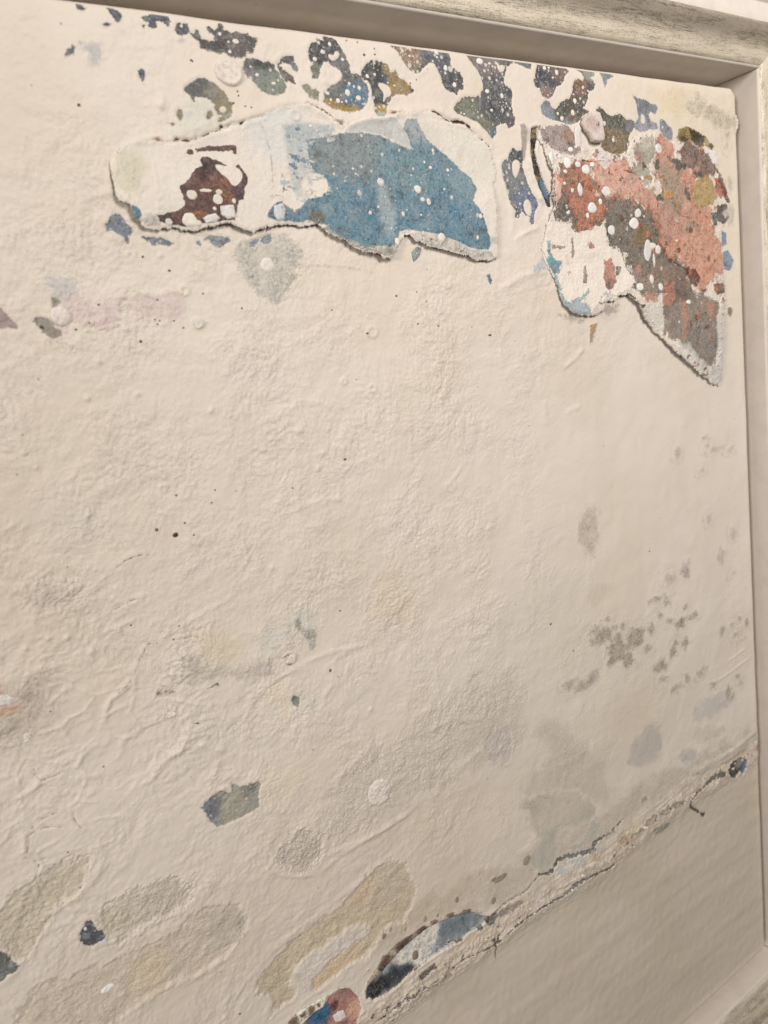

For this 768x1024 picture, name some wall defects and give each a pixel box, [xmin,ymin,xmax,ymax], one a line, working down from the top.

peeling [101,8,123,28]
peeling [105,14,734,386]
peeling [200,781,261,827]
water stain [288,555,757,994]
peeling [79,920,106,947]
peeling [288,909,500,1024]
crack [376,745,736,1023]